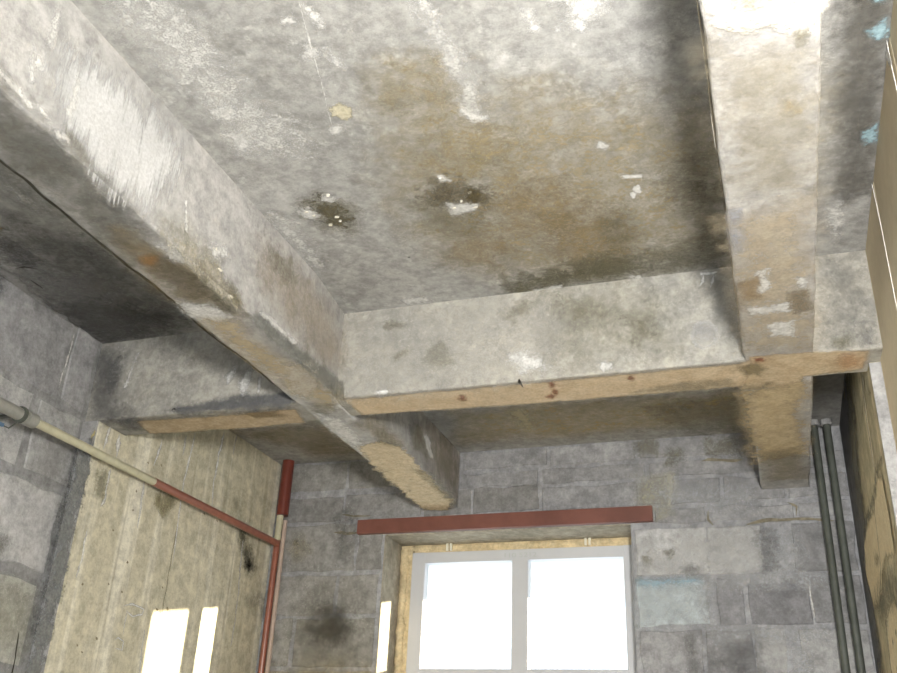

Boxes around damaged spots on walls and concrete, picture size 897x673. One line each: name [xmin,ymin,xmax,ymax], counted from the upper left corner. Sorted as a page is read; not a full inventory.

water stain [46,8,182,212]
spalling [297,194,356,231]
spalling [417,173,492,215]
water stain [623,174,642,199]
water stain [3,236,178,343]
crack [0,159,276,386]